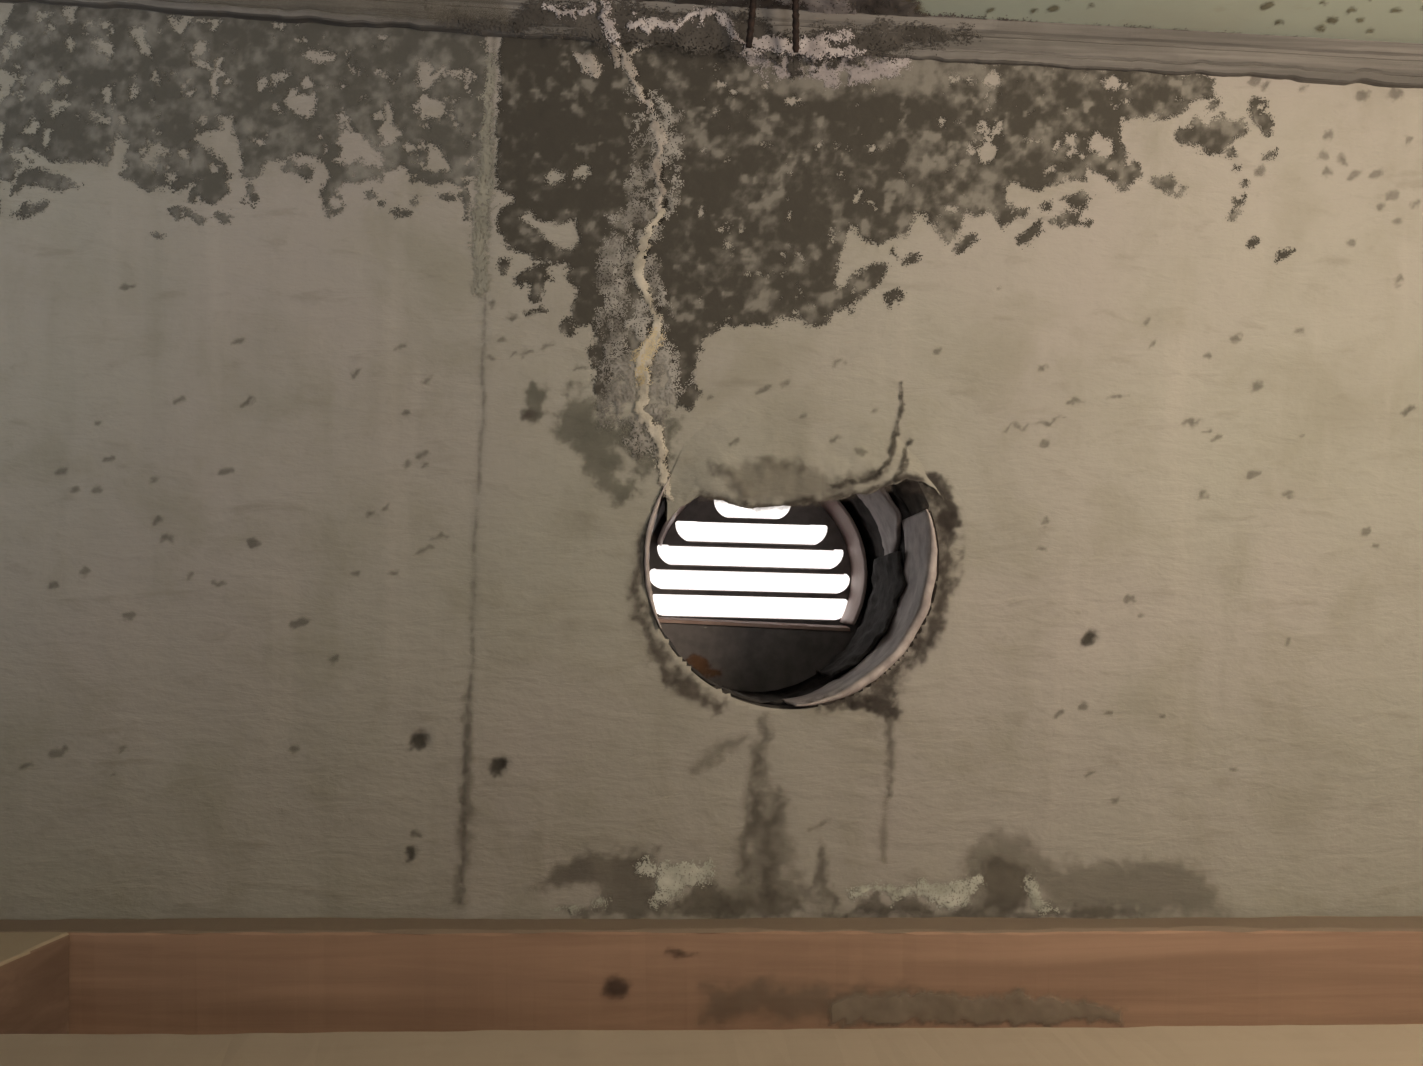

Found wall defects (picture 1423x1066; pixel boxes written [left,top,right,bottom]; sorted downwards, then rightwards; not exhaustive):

damp [422,0,983,65]
crack [541,0,716,502]
damp [522,383,545,420]
damp [558,401,654,502]
crack [833,382,912,488]
efflorescence [632,855,715,911]
efflorescence [846,873,988,913]
efflorescence [1020,868,1060,915]